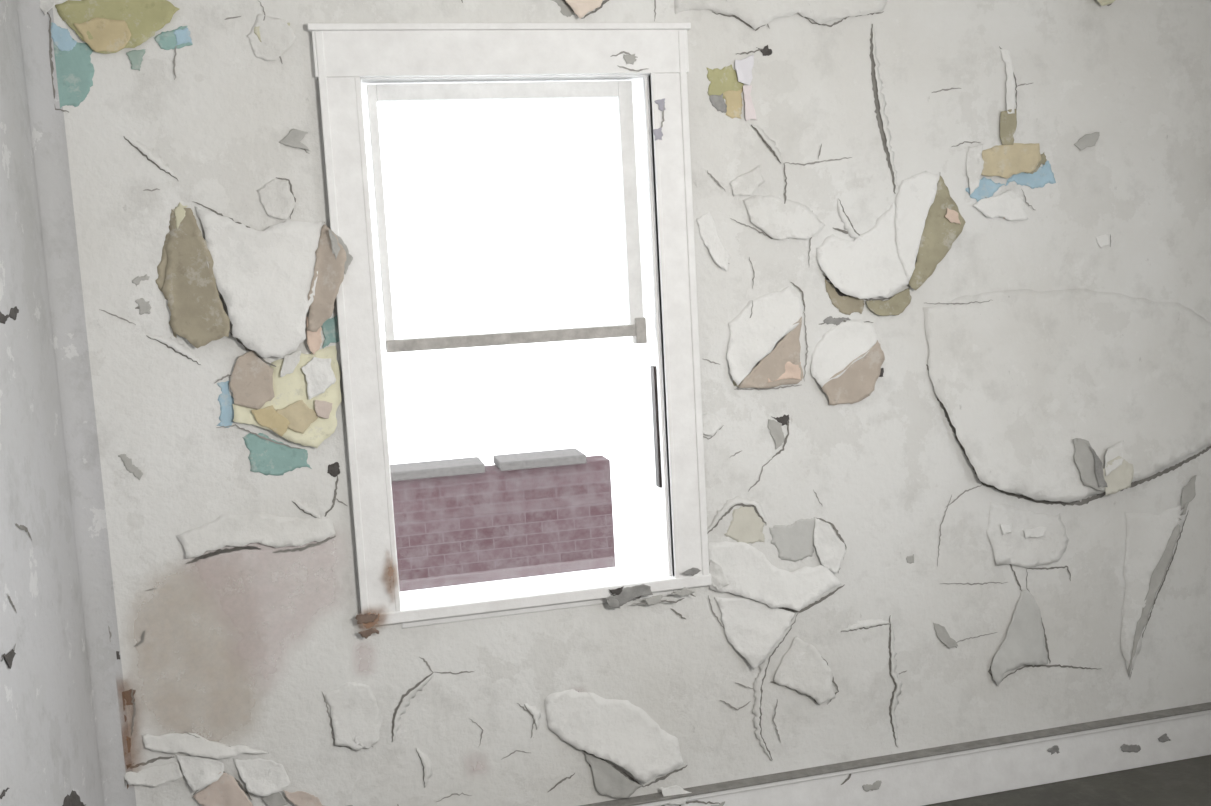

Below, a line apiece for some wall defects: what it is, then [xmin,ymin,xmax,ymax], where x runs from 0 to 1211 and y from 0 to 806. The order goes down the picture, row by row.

peeling [40,0,193,112]
crack [869,24,898,194]
peeling [703,45,1056,405]
peeling [132,177,353,476]
flaking render [292,462,347,519]
corrosion [355,611,382,639]
corrosion [385,564,395,591]
peeling [606,413,847,761]
damp [122,689,136,789]
peeling [124,731,323,806]
crack [392,657,474,802]
crack [470,704,541,760]